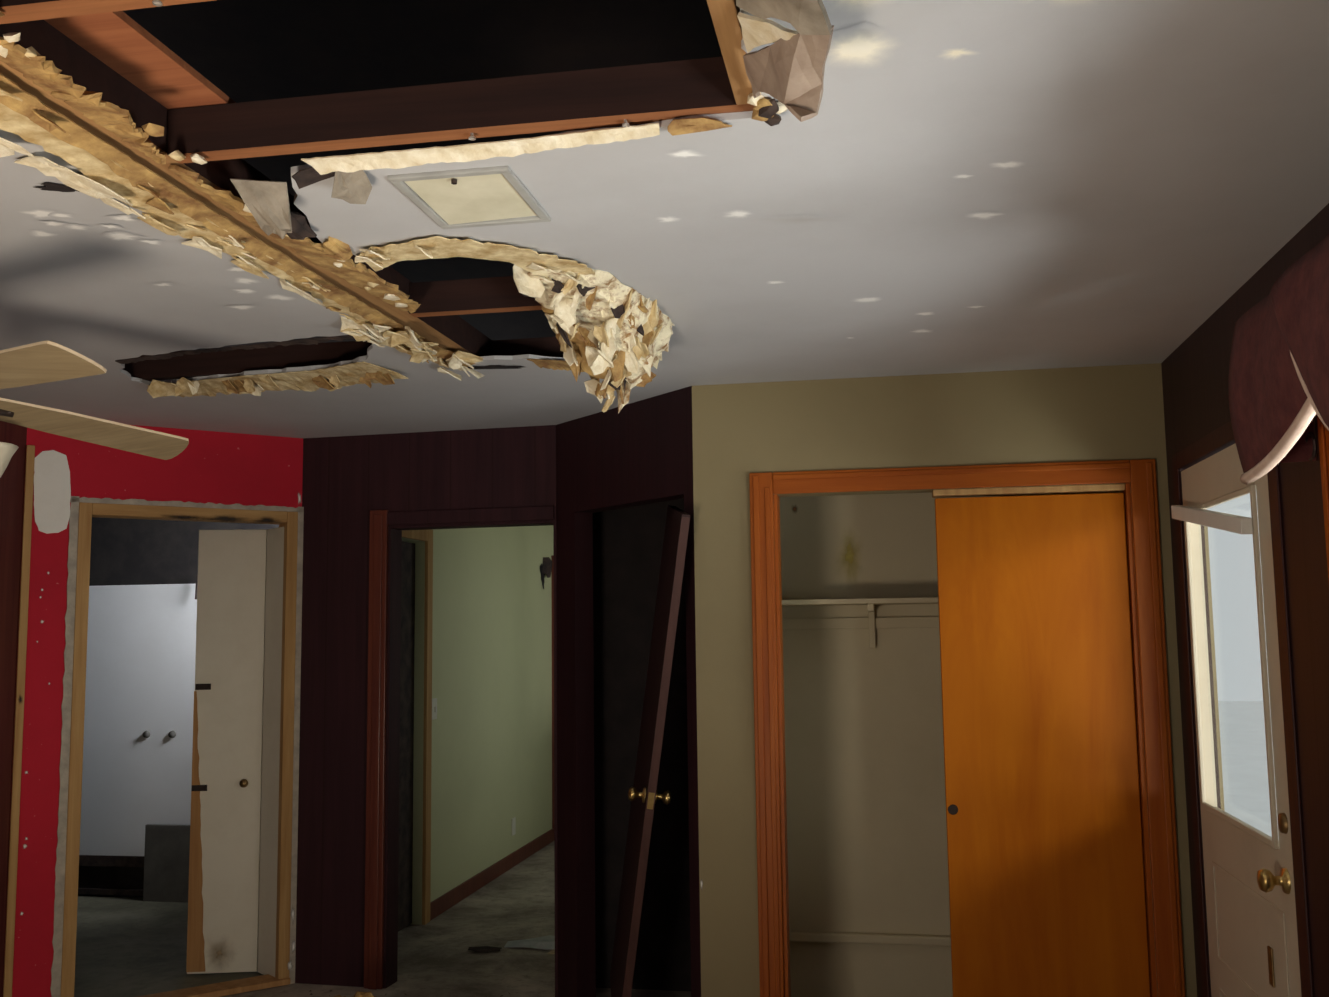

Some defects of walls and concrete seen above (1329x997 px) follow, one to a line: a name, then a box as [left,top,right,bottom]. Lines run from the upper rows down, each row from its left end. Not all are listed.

peeling [662,148,710,159]
peeling [950,160,1028,179]
spalling [0,33,485,381]
peeling [720,209,755,220]
flaking render [513,263,663,412]
peeling [147,377,200,398]
peeling [222,379,264,396]
peeling [312,375,340,392]
peeling [358,371,395,388]